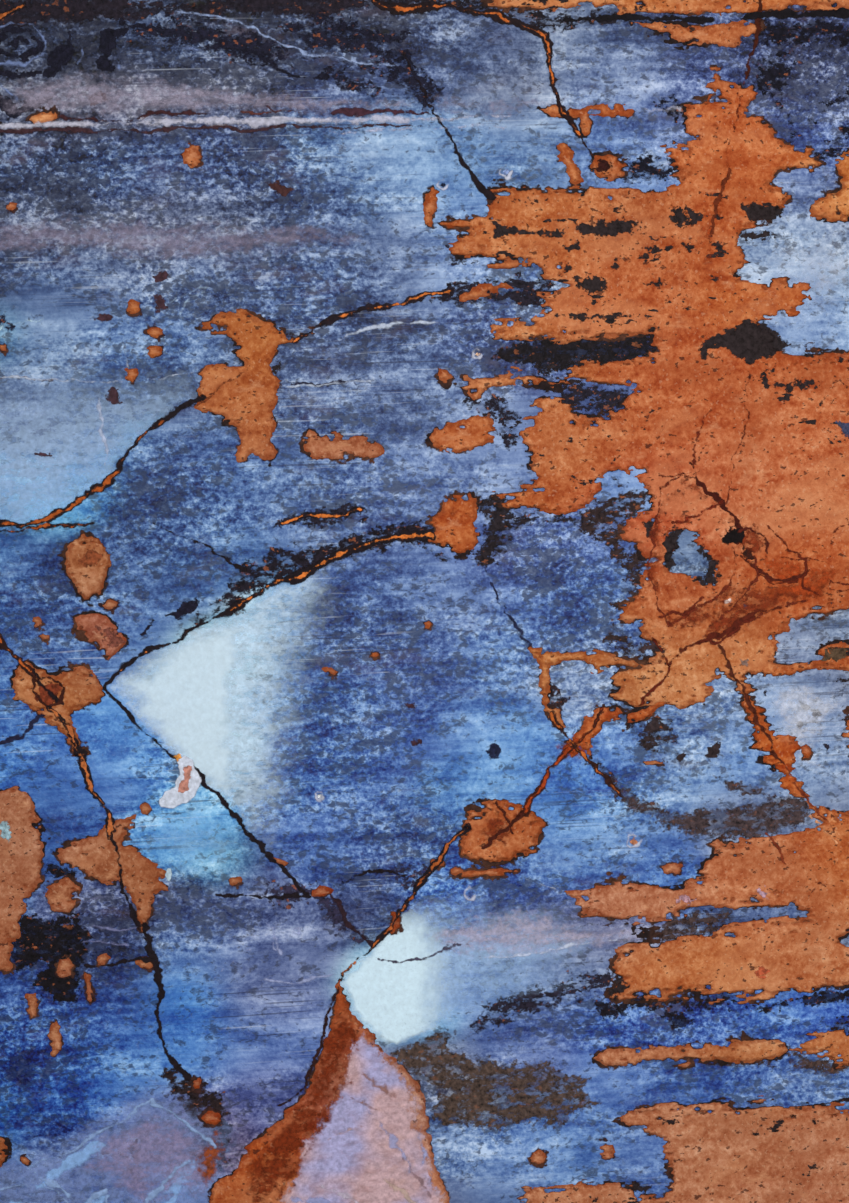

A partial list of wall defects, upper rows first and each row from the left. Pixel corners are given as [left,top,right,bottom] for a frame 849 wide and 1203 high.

peeling [479,0,849,50]
crack [0,52,496,200]
crack [371,0,849,235]
crack [0,372,242,533]
peeling [194,308,318,467]
crack [293,288,453,343]
peeling [423,65,849,1009]
crack [0,633,192,1081]
peeling [0,754,201,975]
crack [103,523,622,1106]
peeling [590,1015,849,1070]
peeling [517,1095,849,1203]